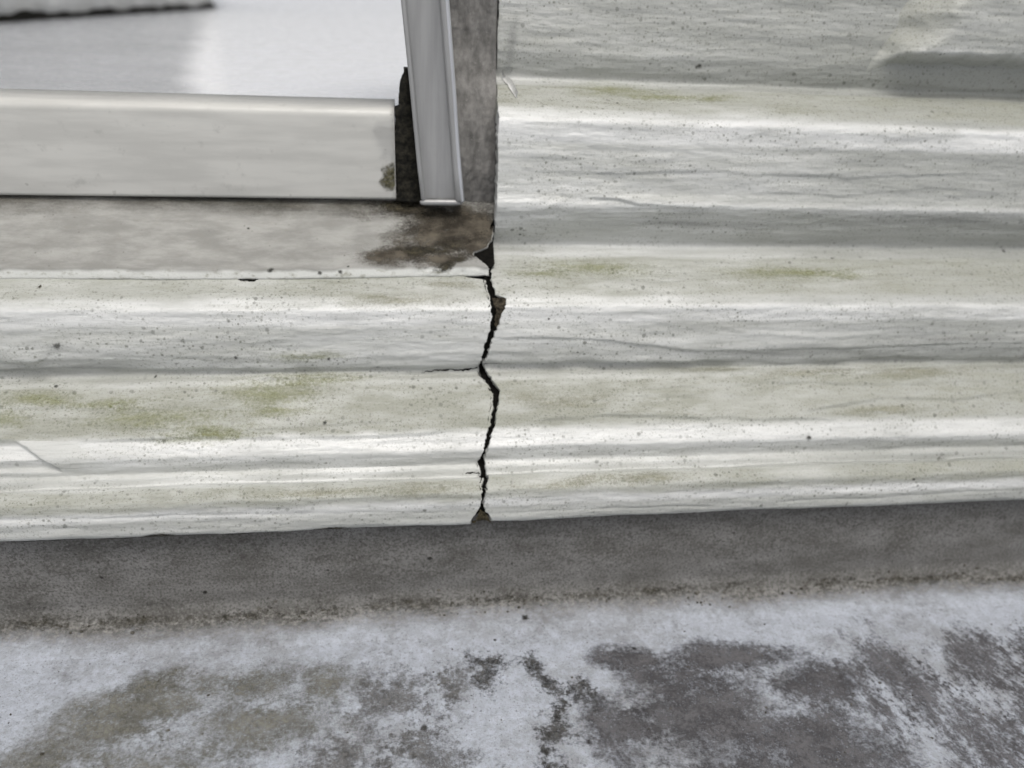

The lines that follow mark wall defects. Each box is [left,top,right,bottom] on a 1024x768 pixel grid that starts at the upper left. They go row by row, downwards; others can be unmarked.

water stain [370,163,465,221]
water stain [397,241,466,257]
crack [424,220,500,516]
water stain [0,665,477,768]
water stain [825,627,1024,768]